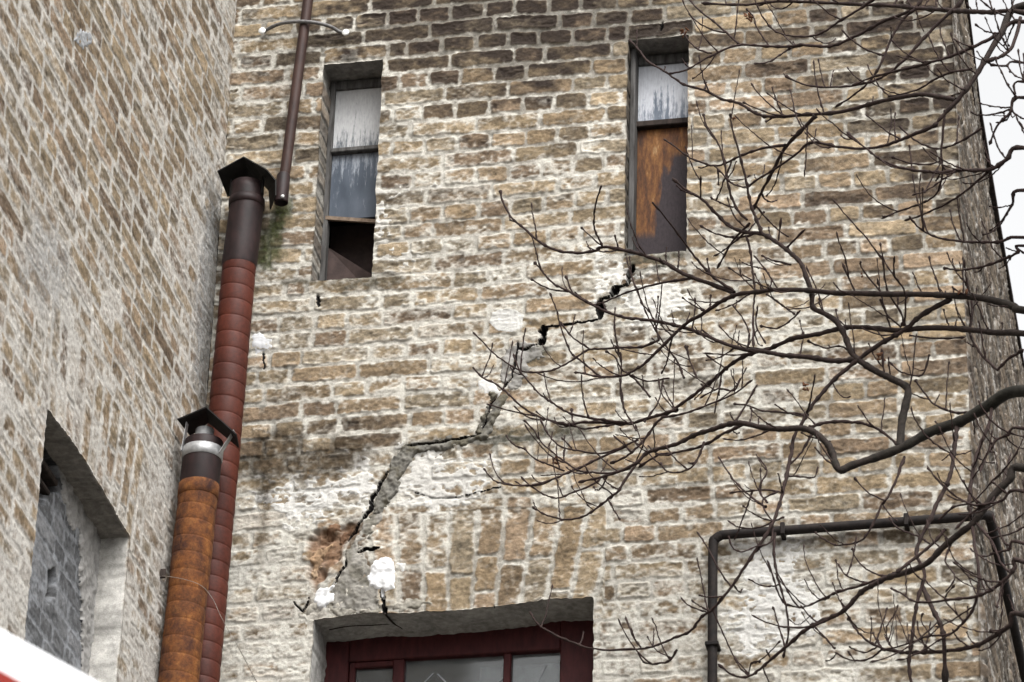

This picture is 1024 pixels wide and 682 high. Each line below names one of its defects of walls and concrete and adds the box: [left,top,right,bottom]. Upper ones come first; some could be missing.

crack [410,264,635,447]
peeling [238,448,379,580]
crack [335,471,389,584]
crack [455,486,501,498]
crack [294,597,310,613]
crack [329,588,402,630]